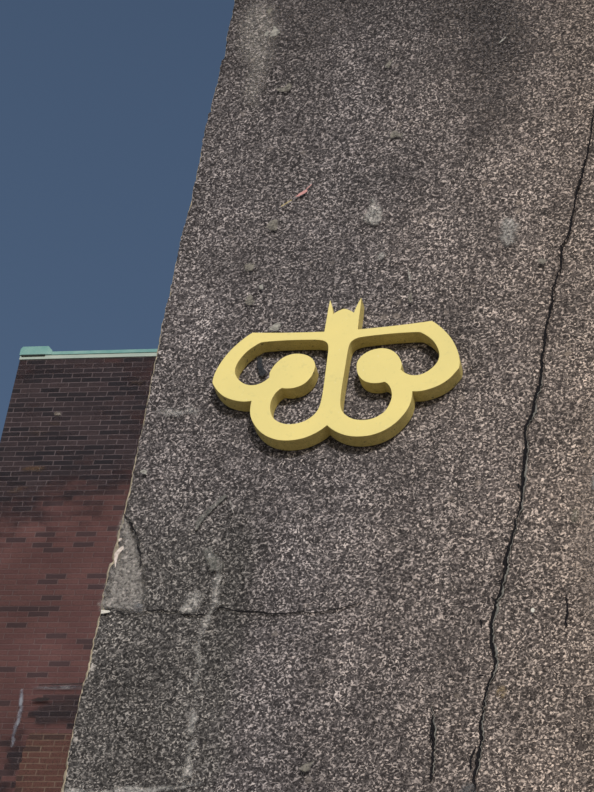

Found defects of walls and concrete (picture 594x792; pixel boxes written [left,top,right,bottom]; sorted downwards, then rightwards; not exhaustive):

crack [469,109,594,792]
spalling [101,514,145,613]
crack [111,601,361,616]
crack [429,707,437,781]